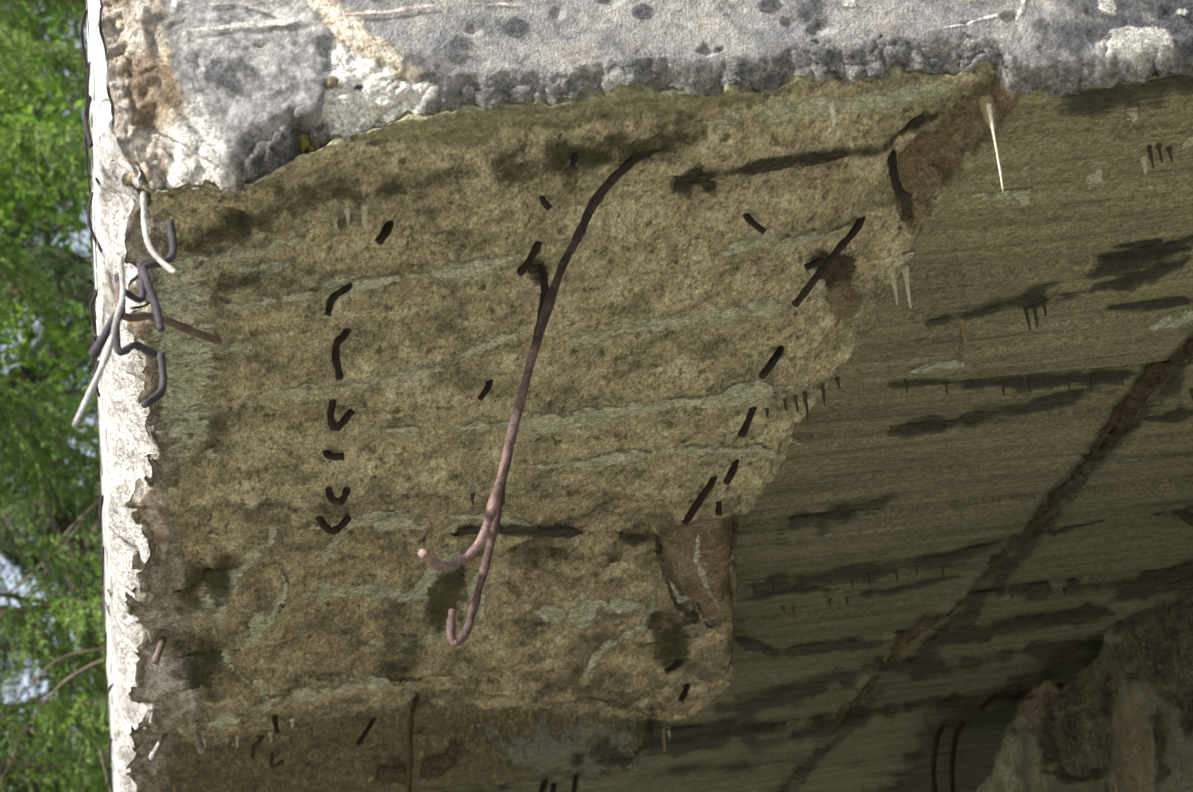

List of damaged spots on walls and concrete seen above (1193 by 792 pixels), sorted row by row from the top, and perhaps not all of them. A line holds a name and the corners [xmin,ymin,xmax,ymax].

spalling [102,0,192,194]
crack [672,114,939,194]
spalling [99,144,156,332]
spalling [120,320,163,352]
spalling [133,0,1193,607]
crack [1115,239,1162,249]
spalling [104,347,216,792]
crack [1034,520,1104,536]
crack [1154,506,1193,526]
spalling [164,489,735,792]
spalling [1017,642,1119,781]